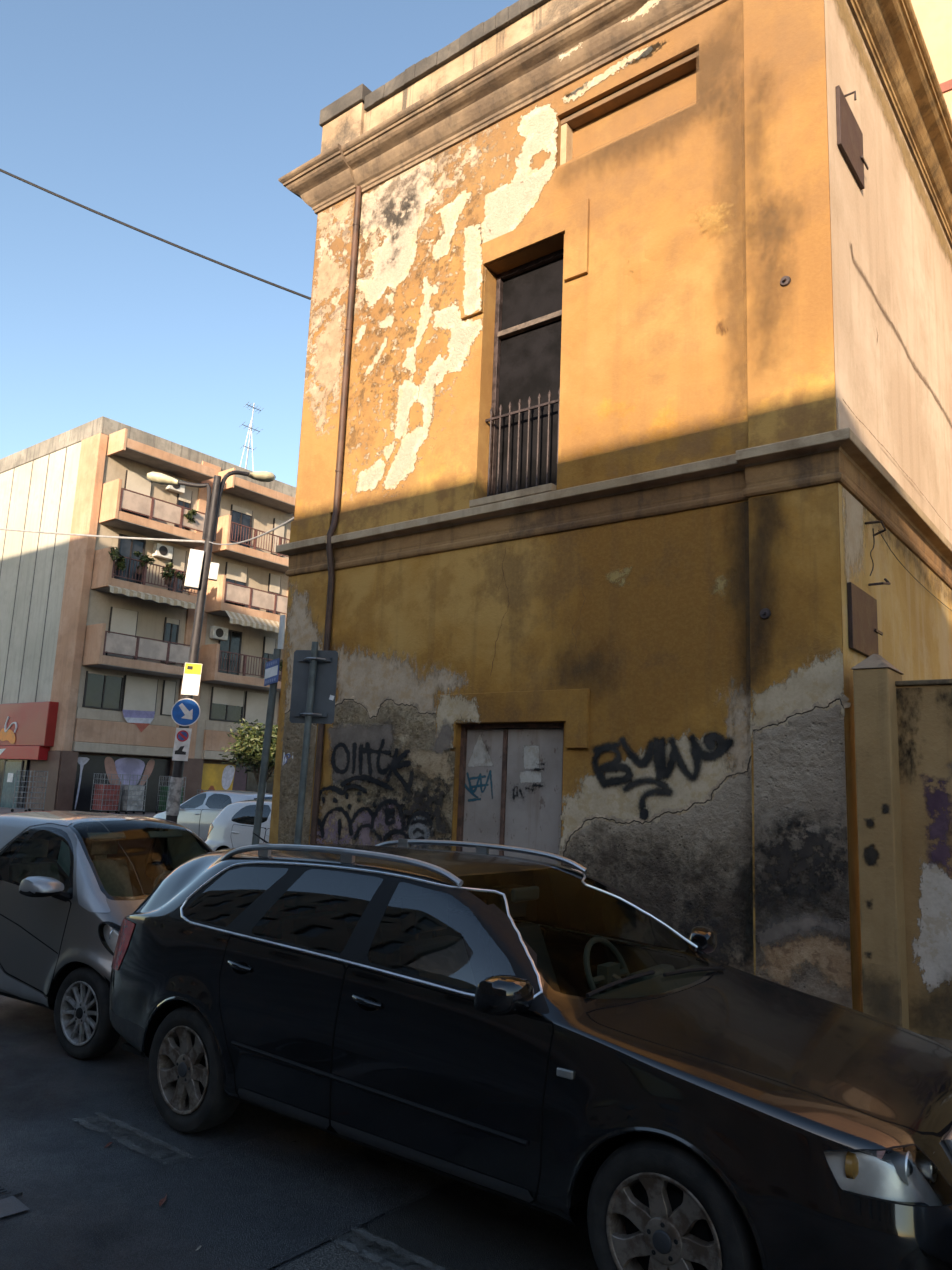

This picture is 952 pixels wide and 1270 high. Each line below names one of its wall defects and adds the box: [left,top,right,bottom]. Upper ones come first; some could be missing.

peeling [303,44,653,493]
spalling [319,786,371,844]
peeling [281,582,481,784]
peeling [559,648,845,854]
leakage [730,495,777,688]
leakage [668,815,848,967]
spalling [755,933,851,991]